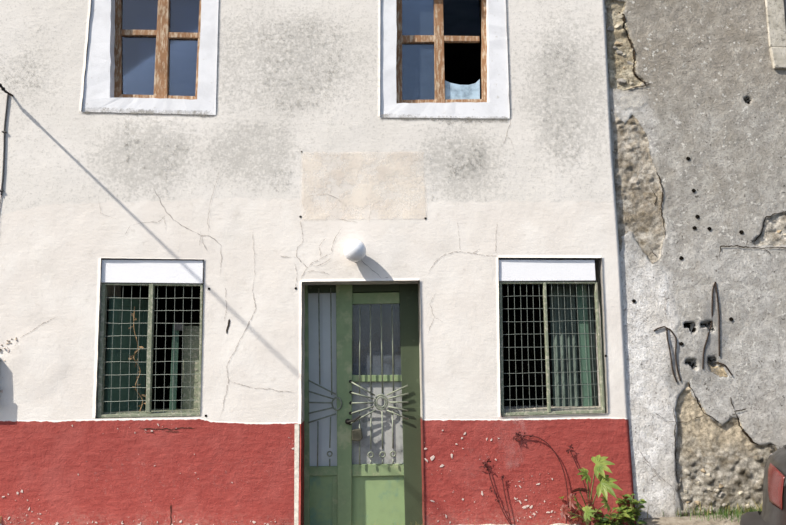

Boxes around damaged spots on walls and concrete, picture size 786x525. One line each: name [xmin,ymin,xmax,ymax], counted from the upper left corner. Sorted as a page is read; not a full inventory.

spalling [605,0,643,90]
crack [126,174,227,320]
spalling [610,105,666,264]
spalling [752,213,786,246]
crack [220,235,288,417]
spalling [707,358,728,377]
spalling [676,382,777,516]